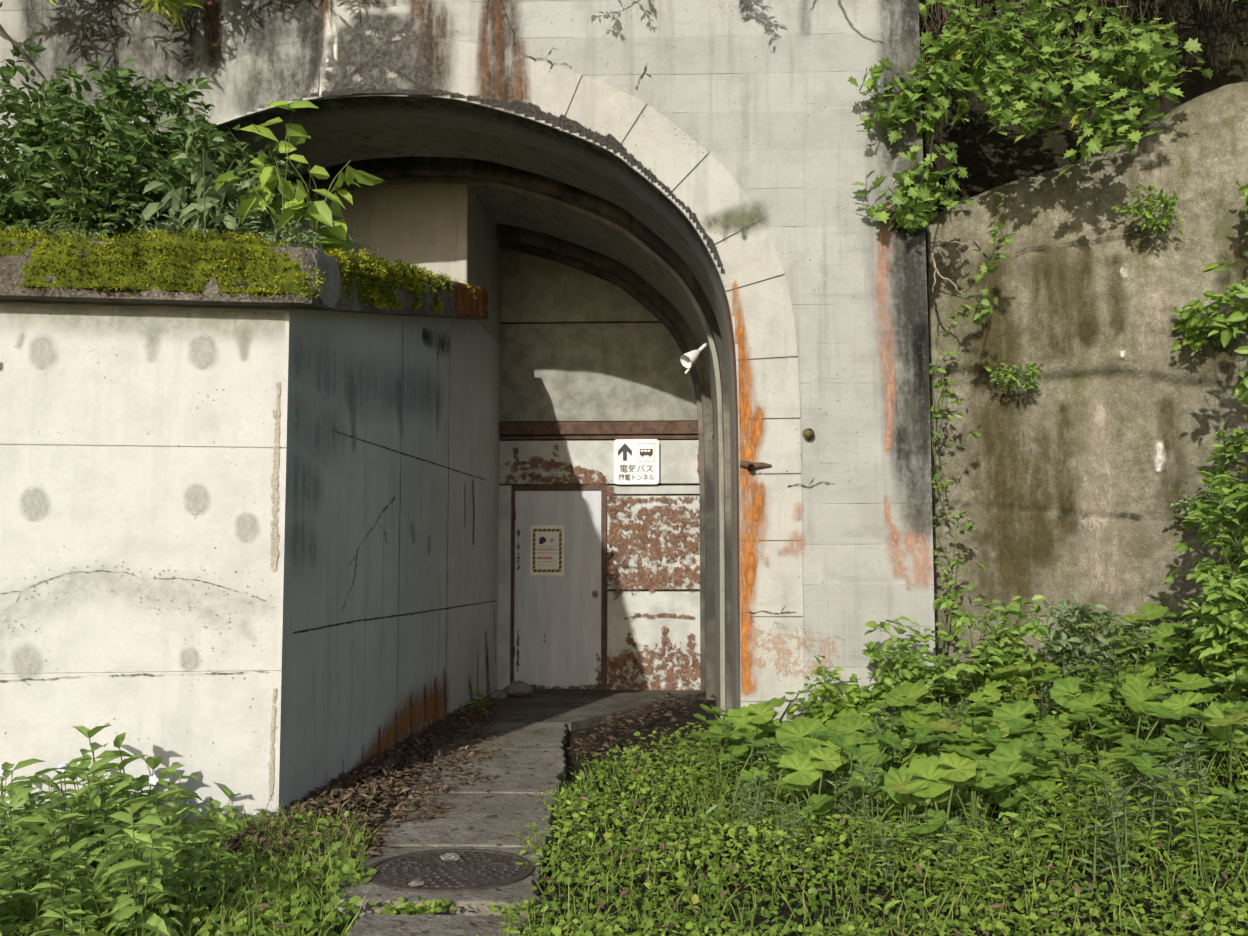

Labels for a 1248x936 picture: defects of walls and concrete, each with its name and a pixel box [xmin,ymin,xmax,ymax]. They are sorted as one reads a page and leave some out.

water stain [26,0,230,132]
water stain [202,0,765,263]
corrosion [479,0,527,111]
corrosion [877,206,895,451]
water stain [884,0,932,537]
corrosion [500,445,700,600]
corrosion [721,283,768,694]
corrosion [885,499,931,589]
corrosion [531,613,701,690]
corrosion [343,674,447,789]